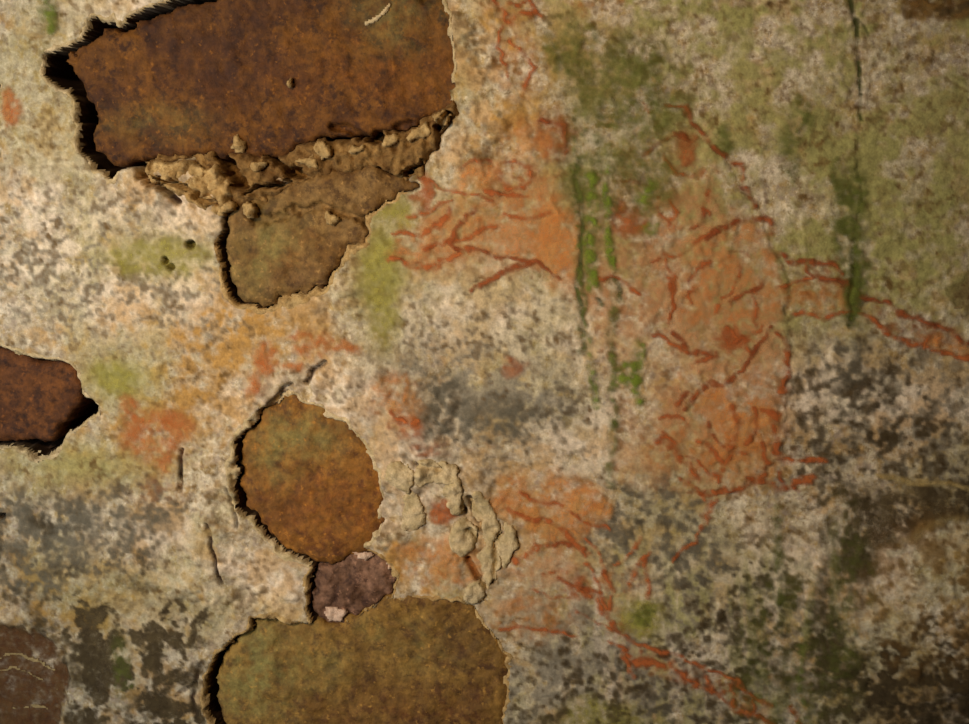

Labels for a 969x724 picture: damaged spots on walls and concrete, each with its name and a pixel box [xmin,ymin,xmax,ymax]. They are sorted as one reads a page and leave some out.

flaking render [39,0,459,315]
damp [572,157,615,336]
flaking render [0,339,100,463]
damp [609,343,645,425]
flaking render [200,389,520,724]